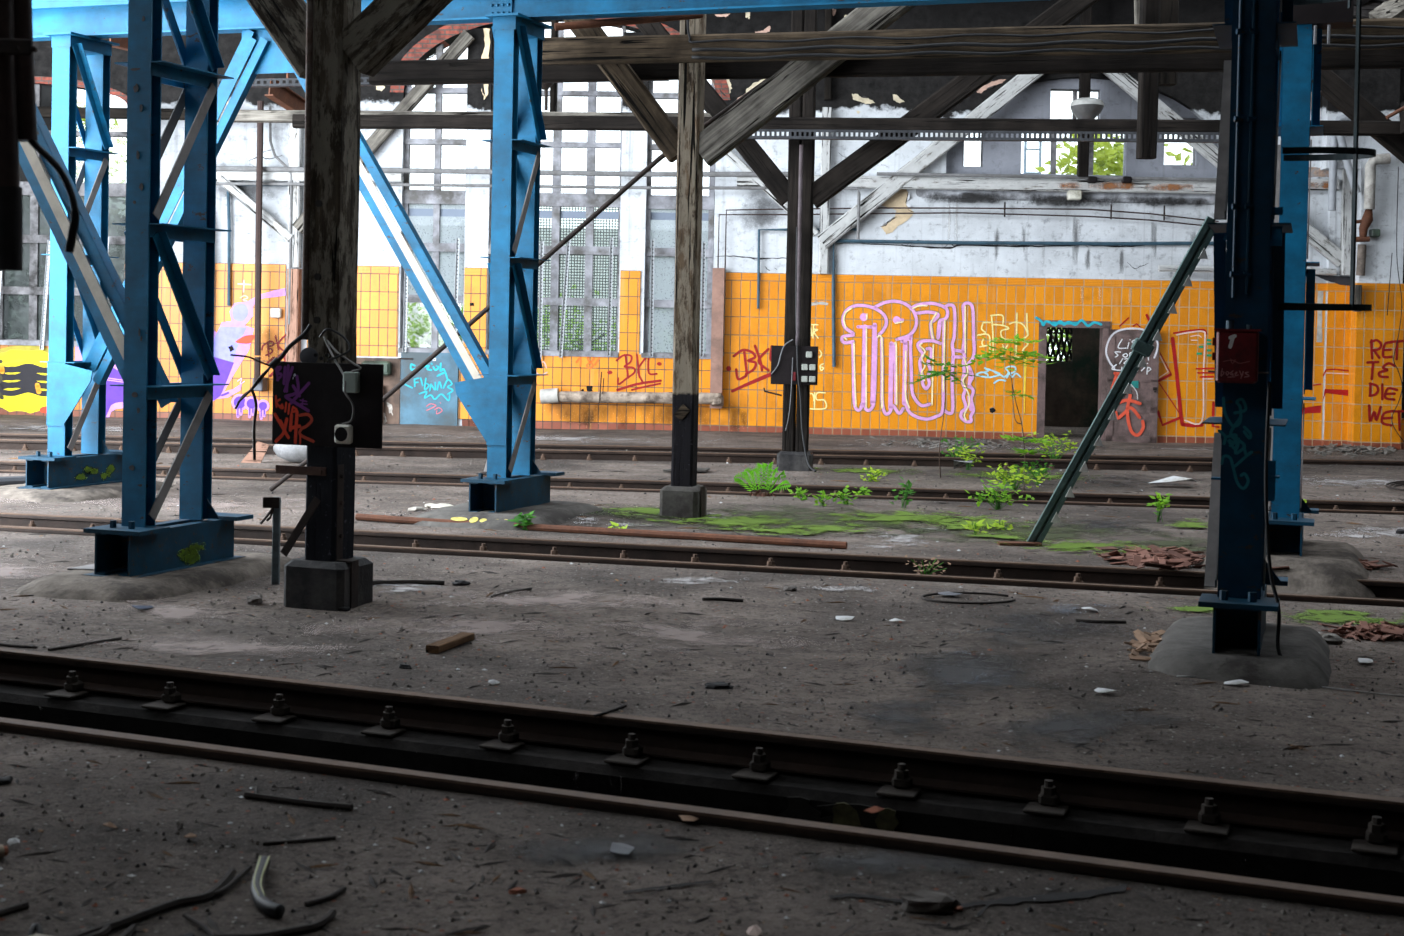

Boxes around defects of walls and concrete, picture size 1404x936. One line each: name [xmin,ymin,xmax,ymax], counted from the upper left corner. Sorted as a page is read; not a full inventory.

peeling [881,189,914,234]